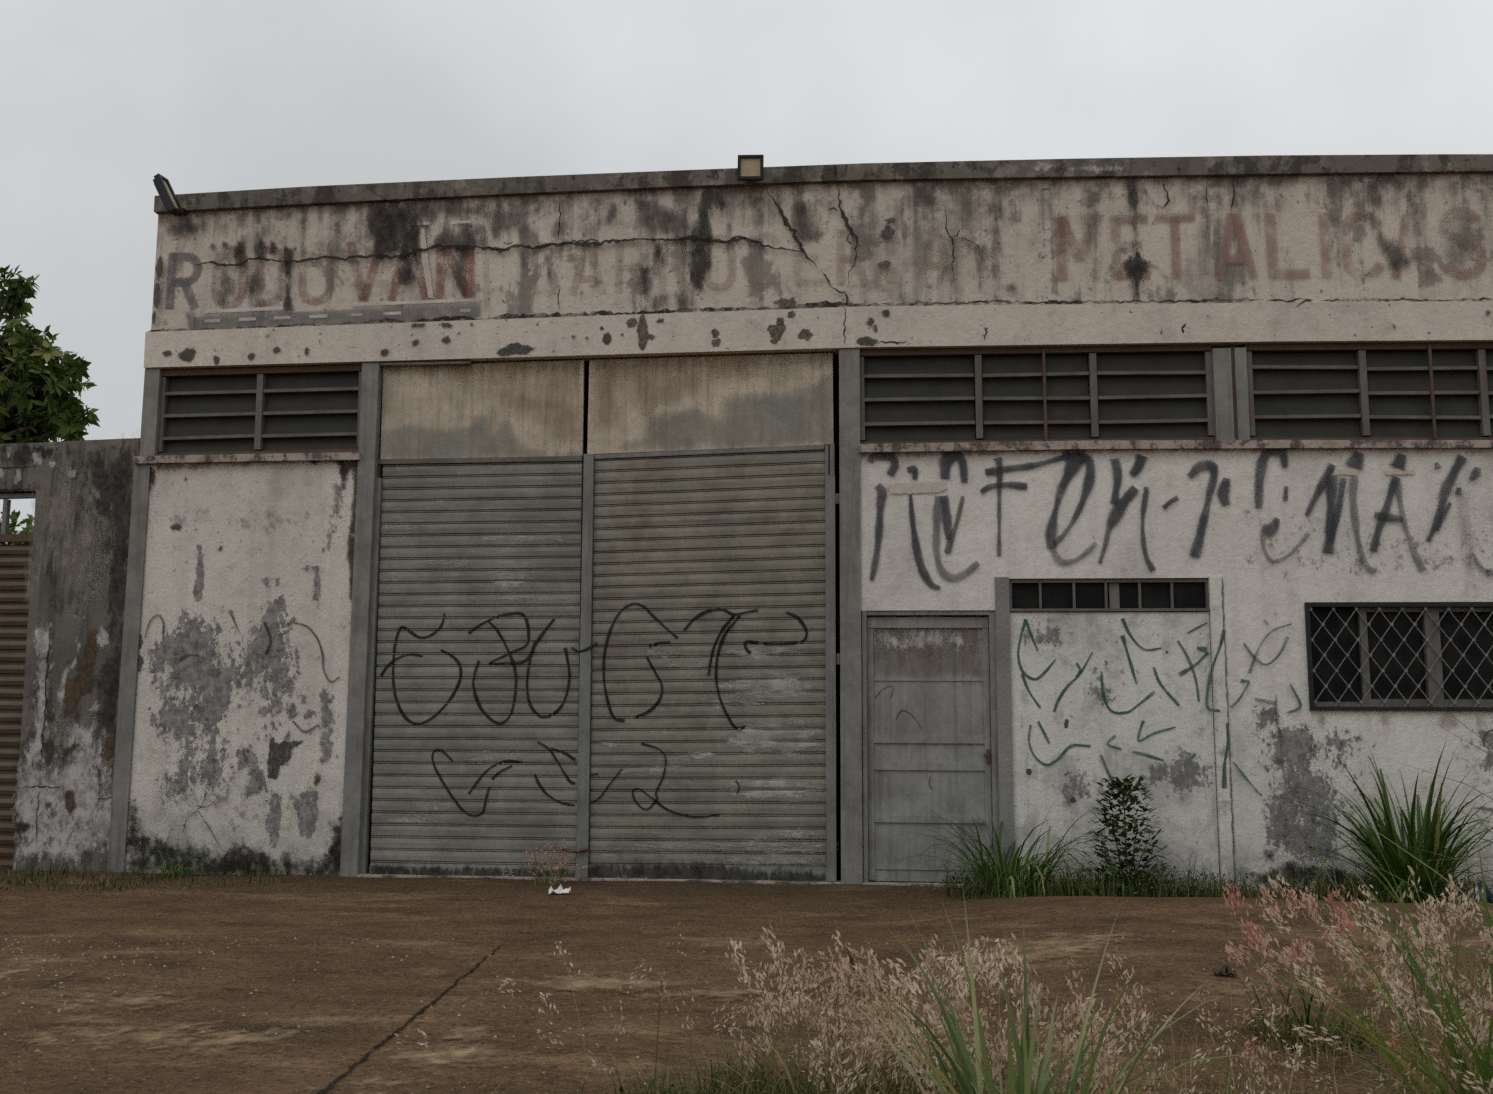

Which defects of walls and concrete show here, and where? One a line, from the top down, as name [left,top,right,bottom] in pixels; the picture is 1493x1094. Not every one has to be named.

water stain [169,220,295,312]
water stain [361,201,508,295]
spalling [497,342,535,356]
spalling [562,317,664,345]
water stain [636,187,726,350]
spalling [767,297,813,344]
crack [148,164,1493,344]
water stain [1122,177,1150,299]
water stain [0,439,155,736]
peeling [138,544,337,848]
peeling [1251,701,1375,864]
crack [316,945,501,1094]